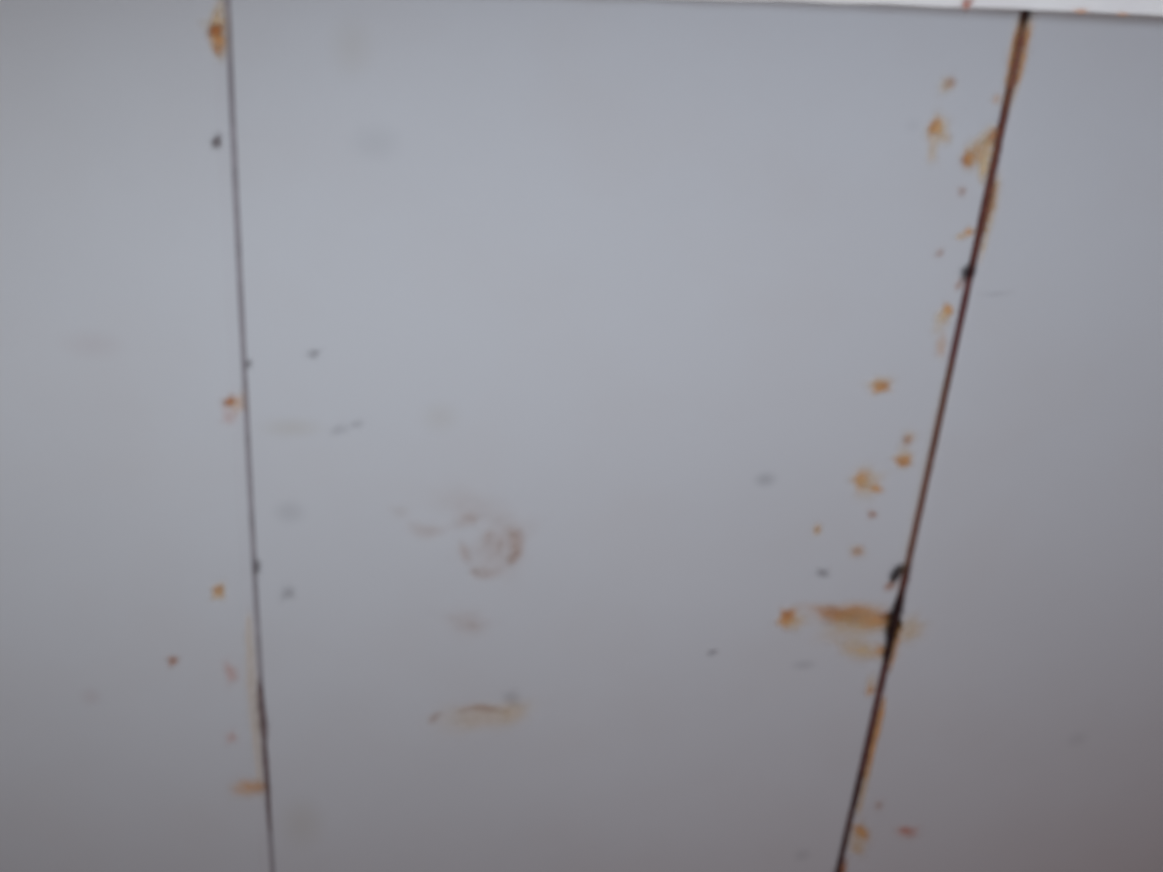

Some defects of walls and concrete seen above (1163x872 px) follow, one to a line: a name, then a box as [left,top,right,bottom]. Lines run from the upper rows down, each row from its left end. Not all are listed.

corrosion [963,11,1030,260]
corrosion [834,572,908,872]